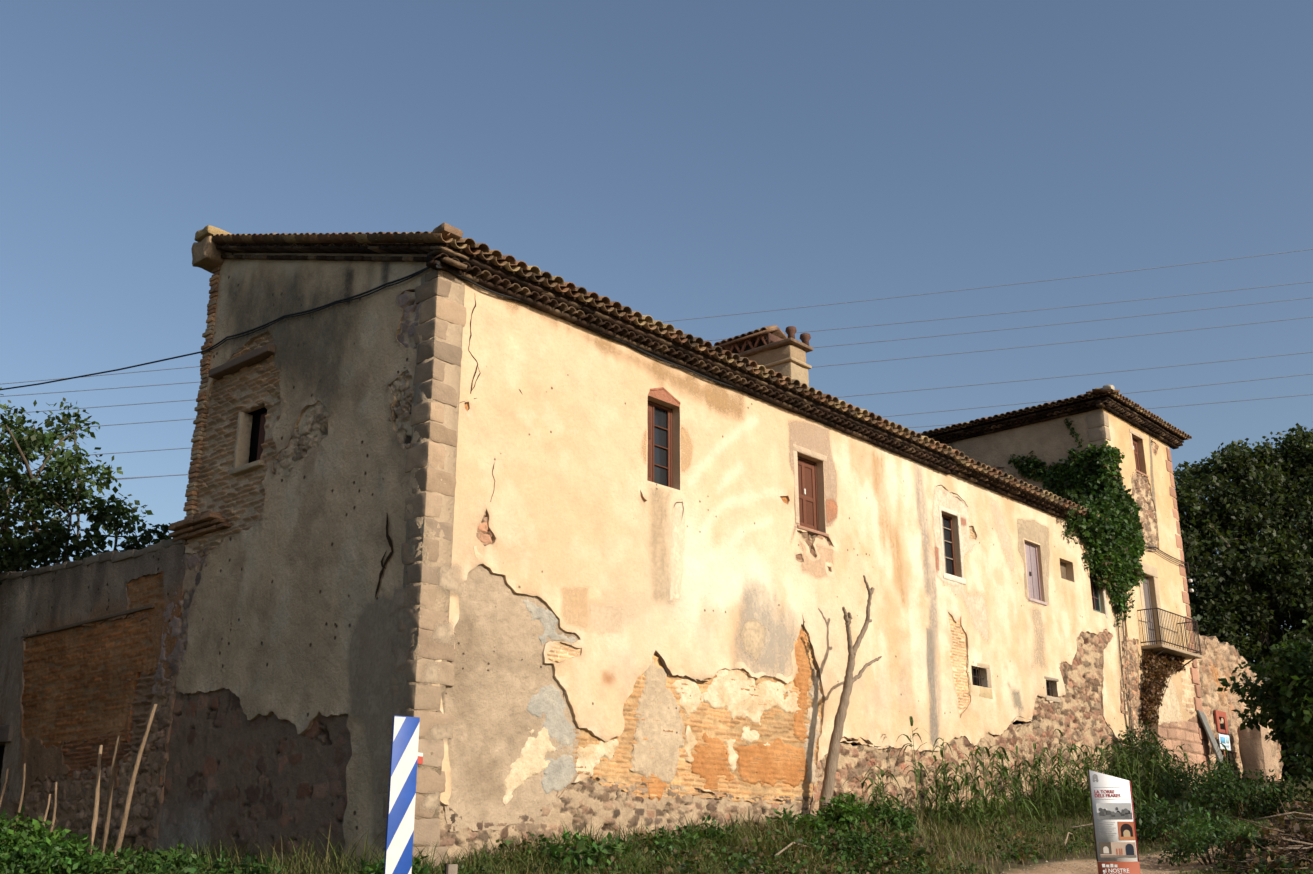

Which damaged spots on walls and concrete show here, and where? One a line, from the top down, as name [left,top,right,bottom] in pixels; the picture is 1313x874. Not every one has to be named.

flaking render [0,328,330,855]
crack [460,300,481,403]
peeling [790,421,837,577]
peeling [439,512,1210,869]